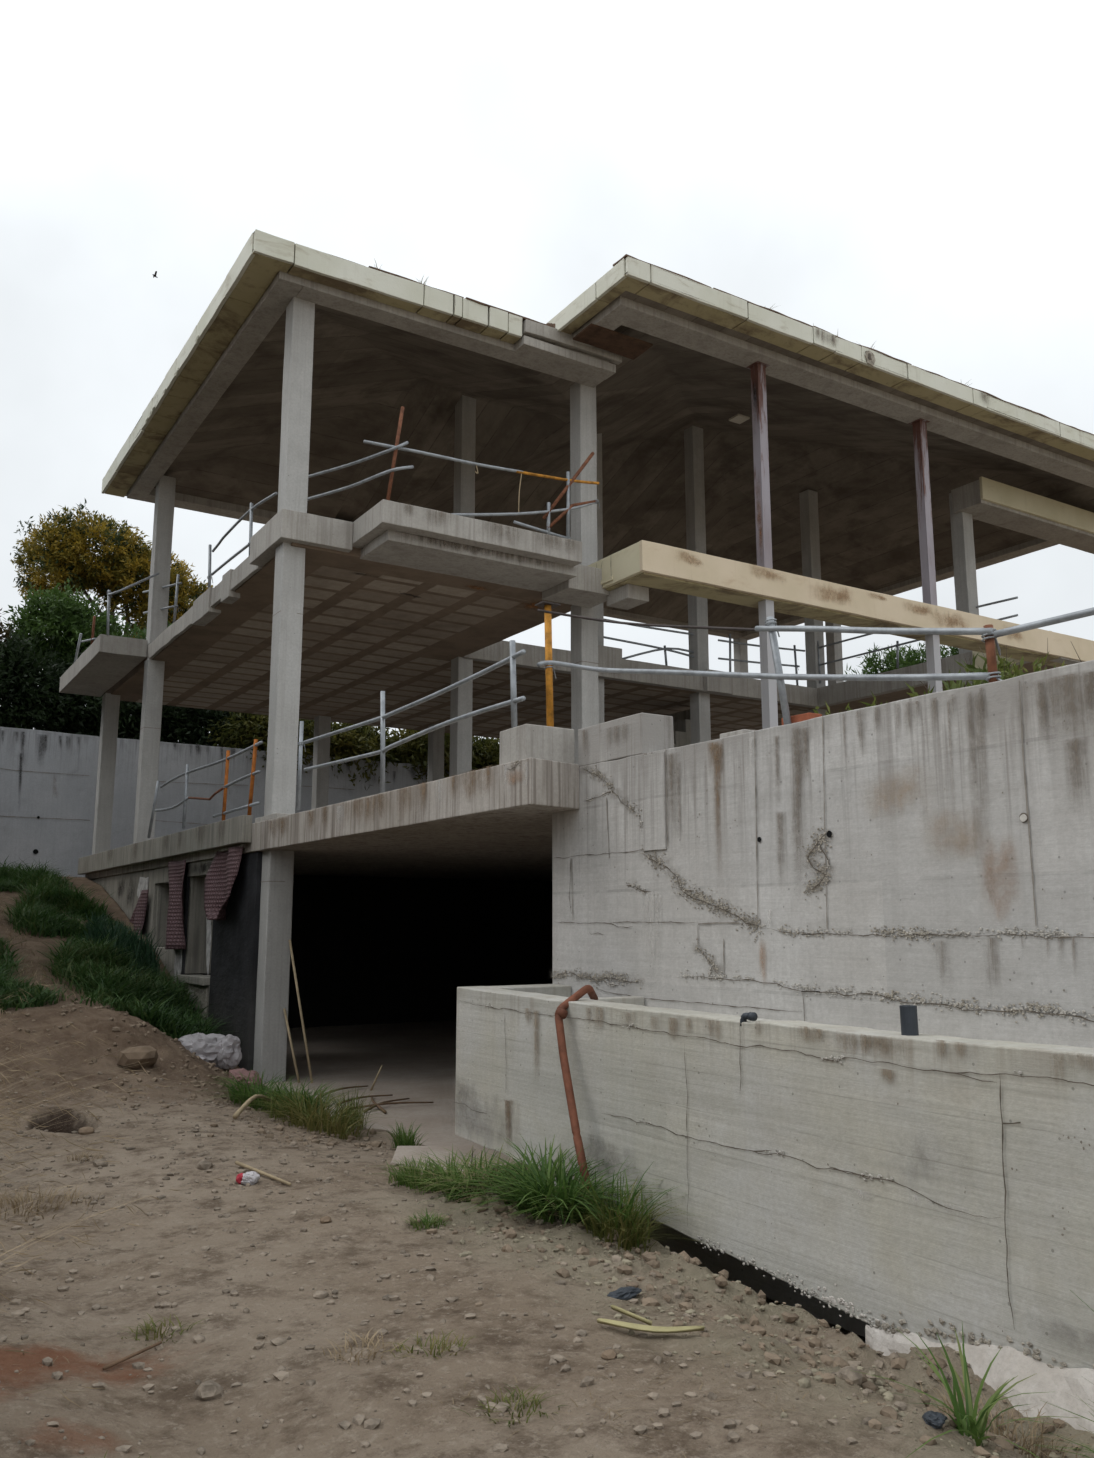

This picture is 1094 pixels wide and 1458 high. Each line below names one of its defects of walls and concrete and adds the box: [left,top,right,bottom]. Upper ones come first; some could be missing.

damp [1039,672,1094,716]
crack [467,765,1094,1330]